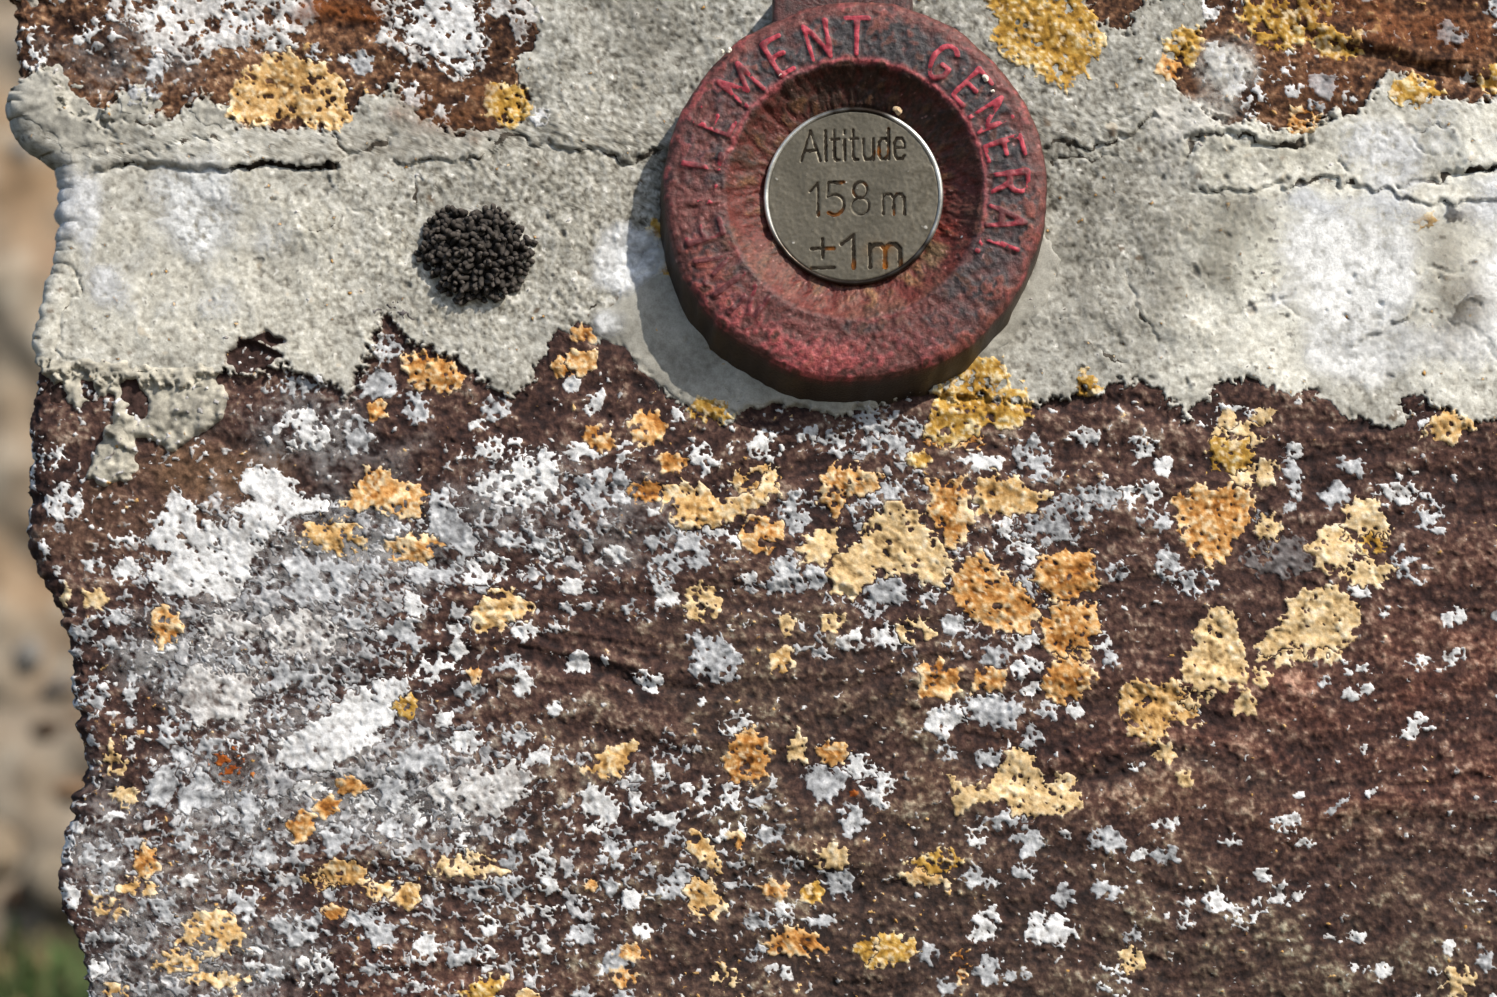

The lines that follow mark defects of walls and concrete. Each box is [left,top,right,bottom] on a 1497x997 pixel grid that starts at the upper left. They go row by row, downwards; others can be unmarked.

crack [117,119,528,210]
crack [573,147,663,165]
crack [1045,114,1154,166]
crack [1186,117,1497,207]